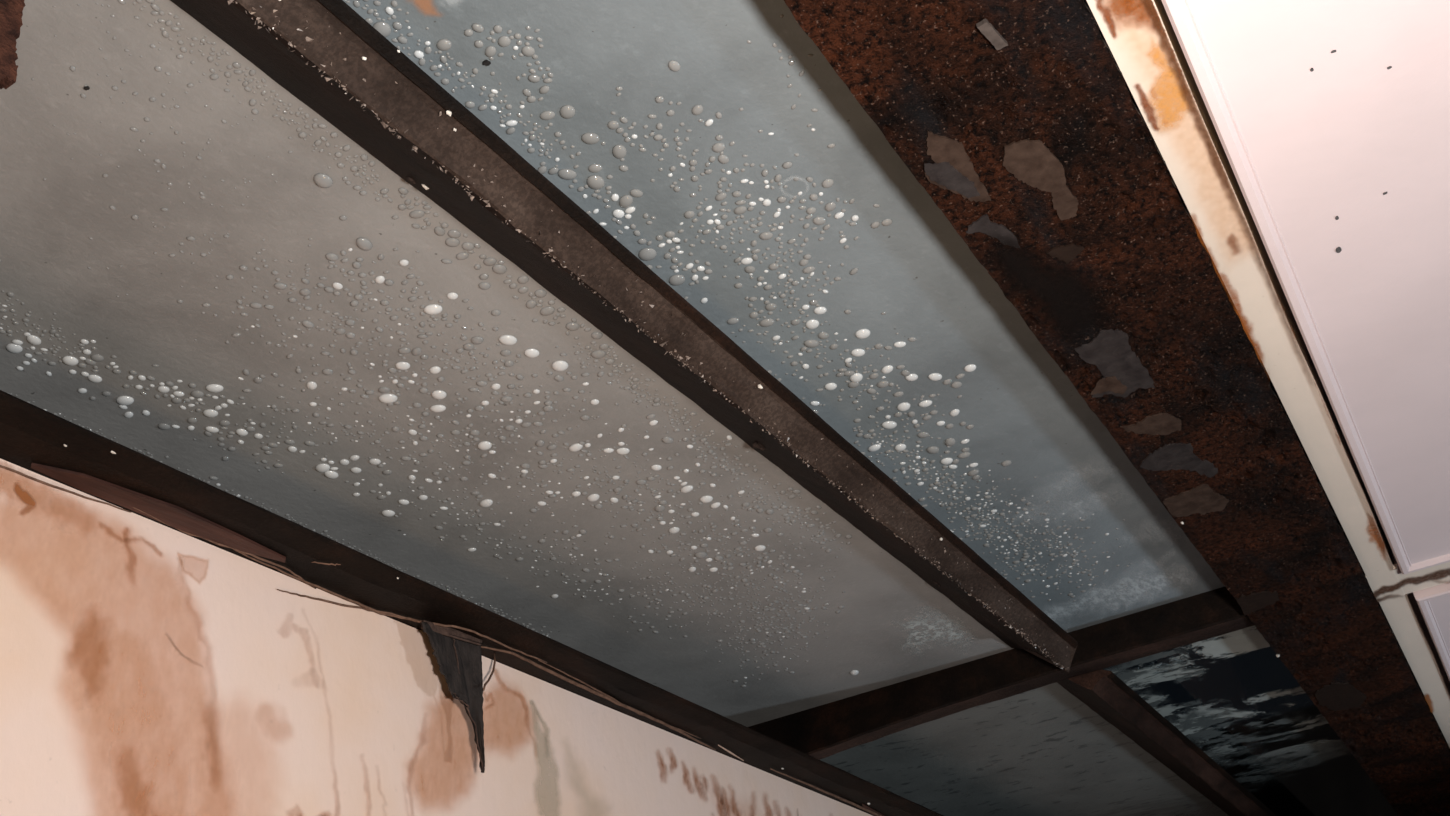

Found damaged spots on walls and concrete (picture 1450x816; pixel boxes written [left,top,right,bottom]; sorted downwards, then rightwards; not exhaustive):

peeling [924,130,1020,248]
peeling [1002,139,1079,220]
rust [1097,0,1279,302]
rust [1195,226,1262,363]
peeling [1074,329,1155,398]
leakage [0,474,35,514]
peeling [1120,412,1229,517]
rust [1368,521,1385,552]